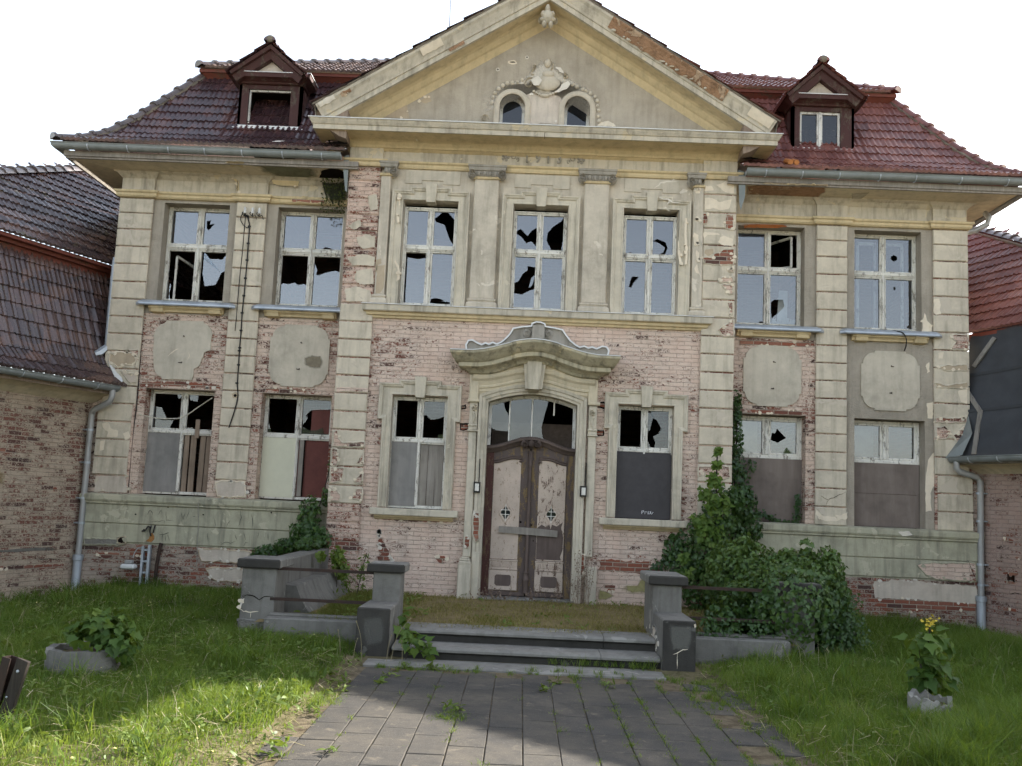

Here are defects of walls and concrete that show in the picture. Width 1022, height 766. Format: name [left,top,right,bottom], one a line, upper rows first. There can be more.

flaking render [608,16,729,101]
flaking render [328,429,365,502]
flaking render [376,519,443,562]